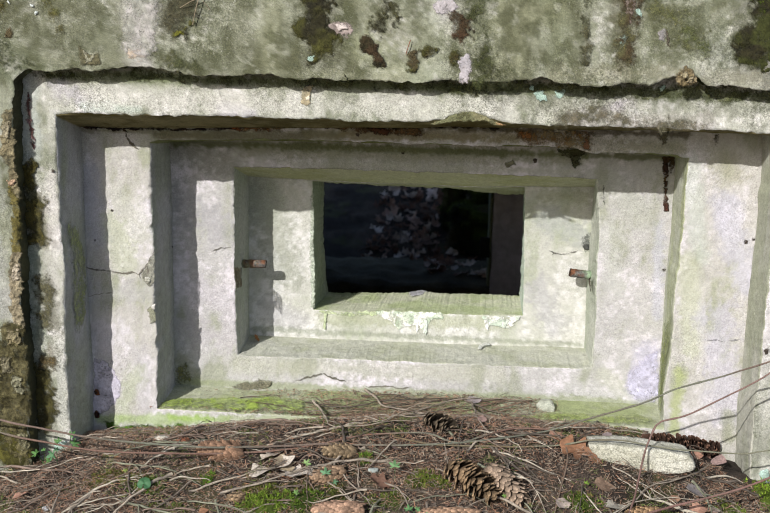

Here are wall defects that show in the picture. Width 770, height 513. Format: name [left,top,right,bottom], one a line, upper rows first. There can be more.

spalling [676,65,697,87]
crack [81,126,297,149]
corrosion [341,127,423,137]
crack [428,124,499,132]
corrosion [515,129,594,150]
corrosion [662,156,675,211]
crack [87,258,150,277]
spalling [141,255,155,287]